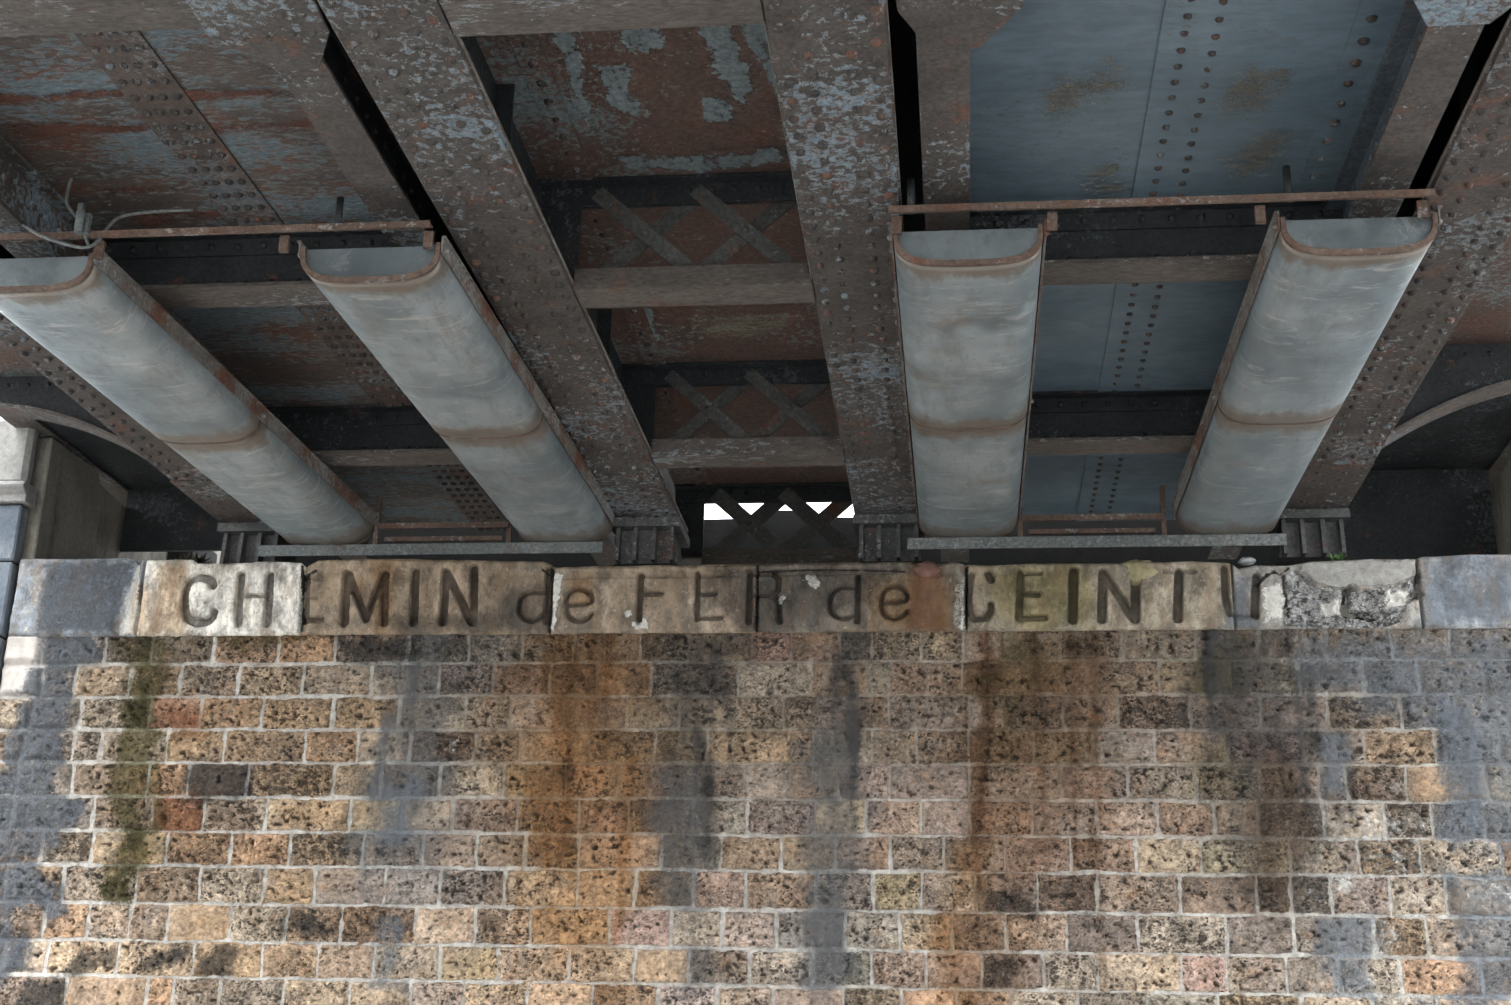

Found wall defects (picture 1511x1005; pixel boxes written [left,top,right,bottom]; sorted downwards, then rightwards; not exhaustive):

peeling [549,28,666,129]
peeling [697,24,778,122]
corrosion [0,90,123,106]
corrosion [184,89,285,101]
corrosion [13,122,150,139]
peeling [617,147,787,174]
corrosion [135,210,227,228]
spalling [1261,570,1422,630]